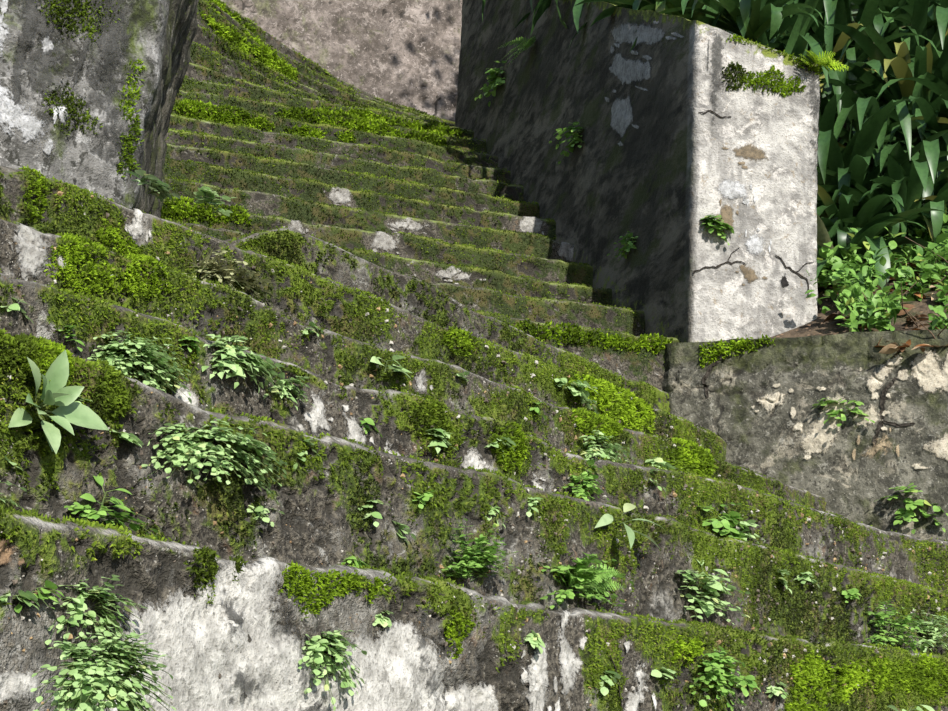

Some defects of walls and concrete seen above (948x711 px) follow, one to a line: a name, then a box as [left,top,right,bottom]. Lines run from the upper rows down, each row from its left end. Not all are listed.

flaking render [605,21,684,147]
crack [693,247,747,274]
crack [776,255,813,295]